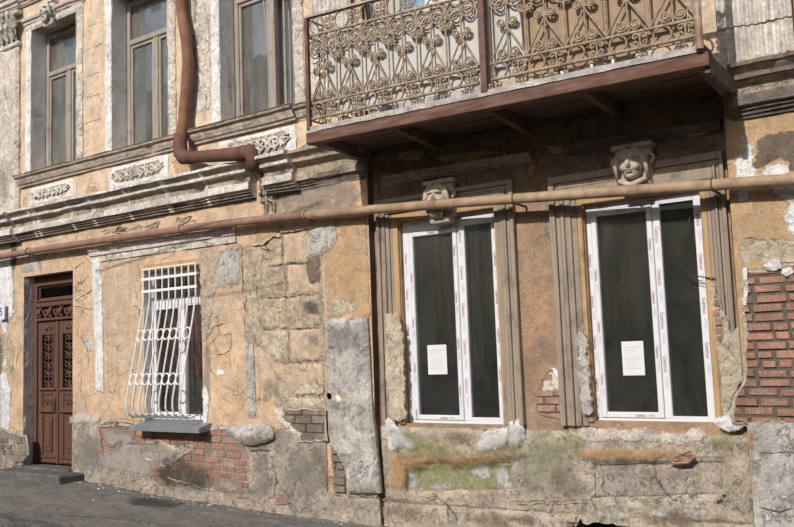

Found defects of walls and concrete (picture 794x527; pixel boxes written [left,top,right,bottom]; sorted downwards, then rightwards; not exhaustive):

peeling [734,131,794,177]
flaking render [0,255,40,465]
crack [28,223,160,409]
peeling [97,260,251,499]
leakage [159,462,208,487]
crack [206,174,324,397]
peeling [199,220,357,493]
peeling [384,313,407,450]
leakage [472,466,507,484]
leakage [476,424,521,452]
flaking render [531,366,560,420]
flaking render [710,186,794,432]